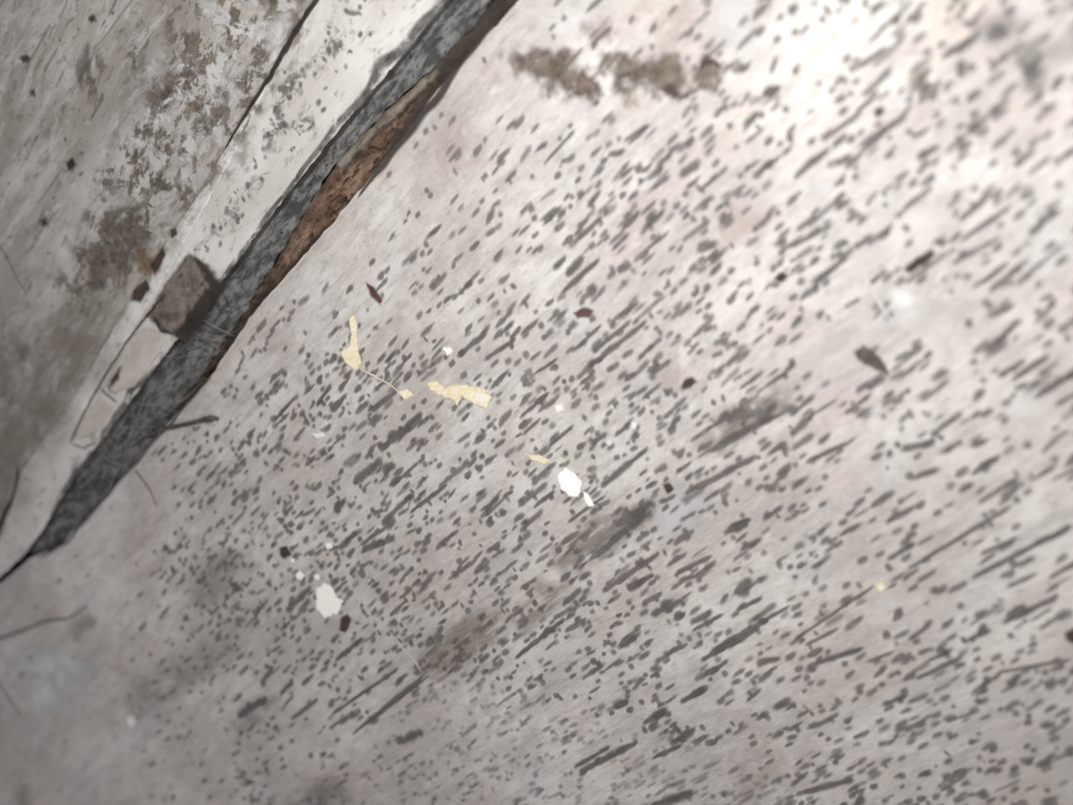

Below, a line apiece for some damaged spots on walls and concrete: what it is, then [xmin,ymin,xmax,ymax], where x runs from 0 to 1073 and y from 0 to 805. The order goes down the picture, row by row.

crack [0,467,18,523]
crack [31,0,519,557]